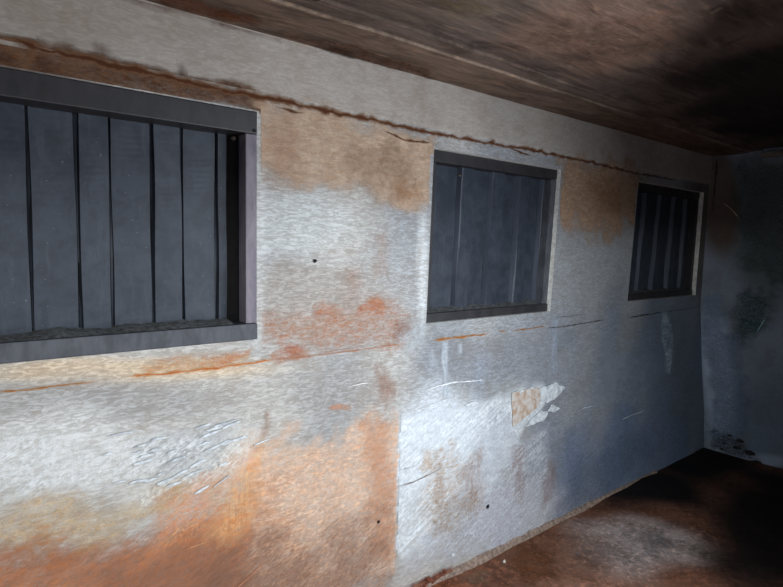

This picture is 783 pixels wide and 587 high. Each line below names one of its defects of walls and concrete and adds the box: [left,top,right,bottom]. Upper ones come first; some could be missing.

crack [2,37,675,180]
corrosion [0,415,399,587]
peeling [396,382,565,564]